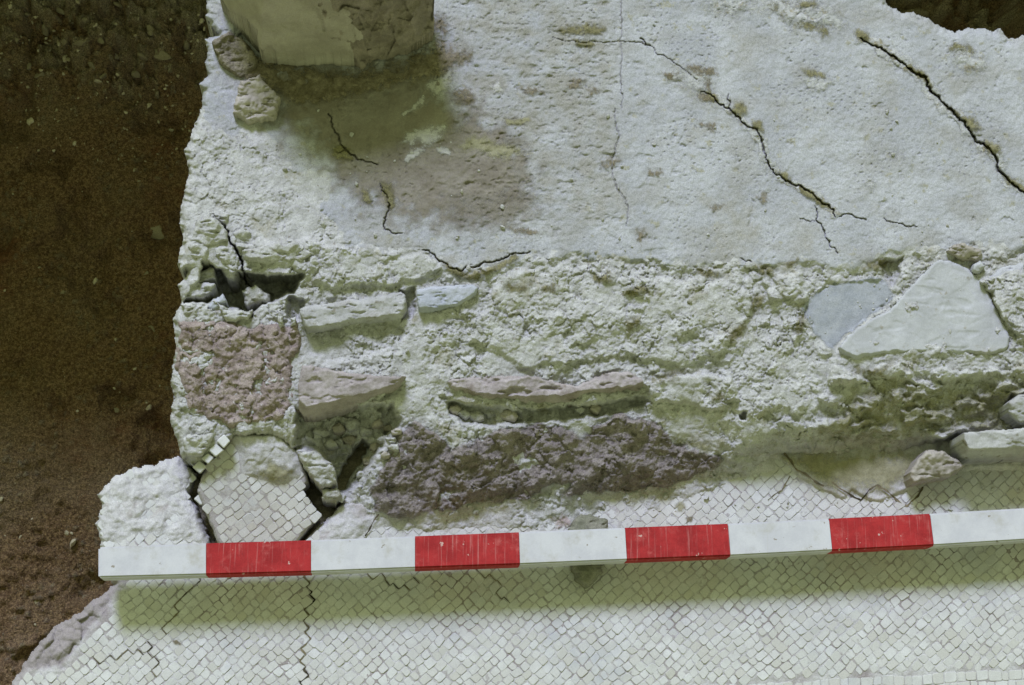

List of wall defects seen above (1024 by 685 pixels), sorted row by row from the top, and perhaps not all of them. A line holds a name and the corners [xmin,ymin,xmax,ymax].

crack [332,126,395,234]
leakage [267,59,531,228]
crack [698,89,850,245]
crack [855,28,1024,193]
crack [435,253,524,280]
spalling [802,277,894,348]
spalling [256,462,293,483]
spalling [370,412,722,519]
spalling [903,450,965,488]